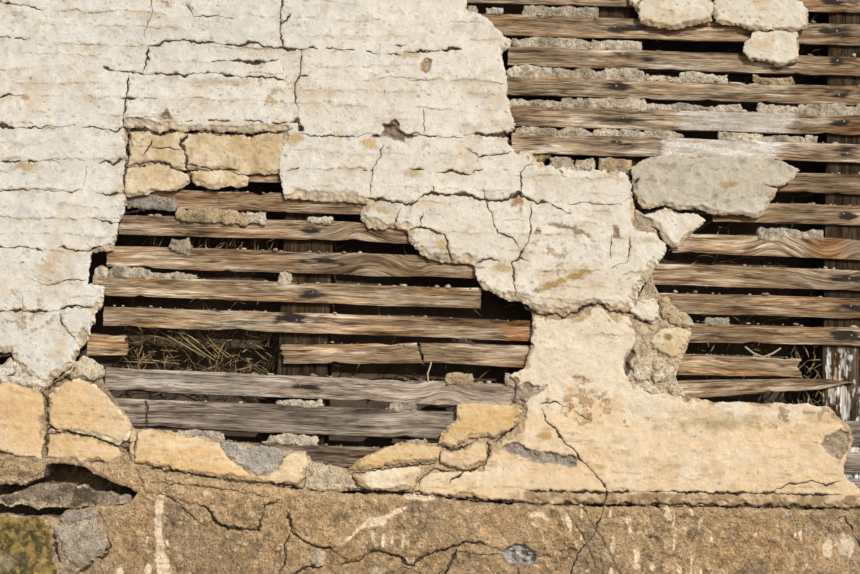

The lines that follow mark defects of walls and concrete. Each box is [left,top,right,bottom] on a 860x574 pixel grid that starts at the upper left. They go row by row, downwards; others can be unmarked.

spalling [373,119,417,141]
crack [0,0,720,324]
crack [0,246,102,340]
spalling [624,349,635,375]
crack [42,367,149,452]
spalling [511,382,550,404]
peeling [563,374,611,425]
spalling [501,442,577,467]
spalling [822,428,851,460]
crack [351,401,860,574]
crack [149,467,519,574]
crack [51,533,112,574]